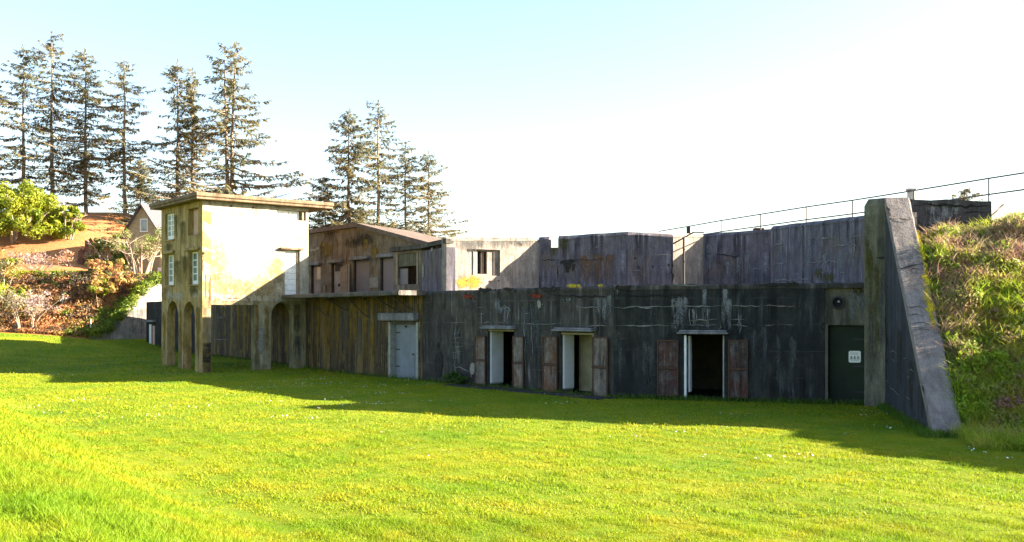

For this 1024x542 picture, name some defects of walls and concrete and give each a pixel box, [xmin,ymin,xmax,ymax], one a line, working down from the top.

leakage [671,289,710,324]